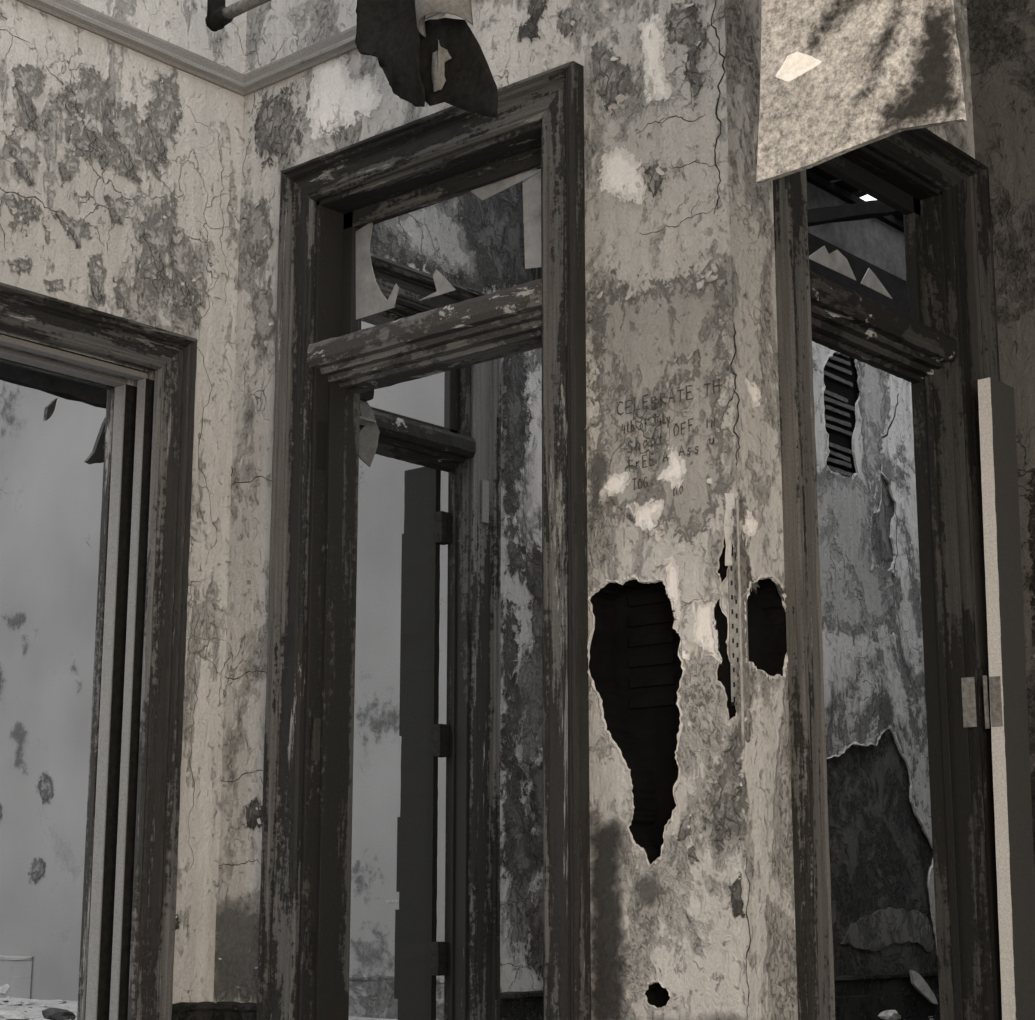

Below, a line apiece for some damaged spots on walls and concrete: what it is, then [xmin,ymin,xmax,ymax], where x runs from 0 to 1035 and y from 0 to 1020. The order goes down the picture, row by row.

crack [0,187,105,250]
peeling [0,55,207,325]
peeling [596,145,667,208]
peeling [587,0,709,121]
crack [636,0,726,235]
peeling [585,260,788,869]
peeling [817,350,901,636]
peeling [28,857,46,885]
peeling [36,771,55,805]
crack [186,611,227,869]
flaking render [826,725,938,976]
flaking render [642,979,672,1010]